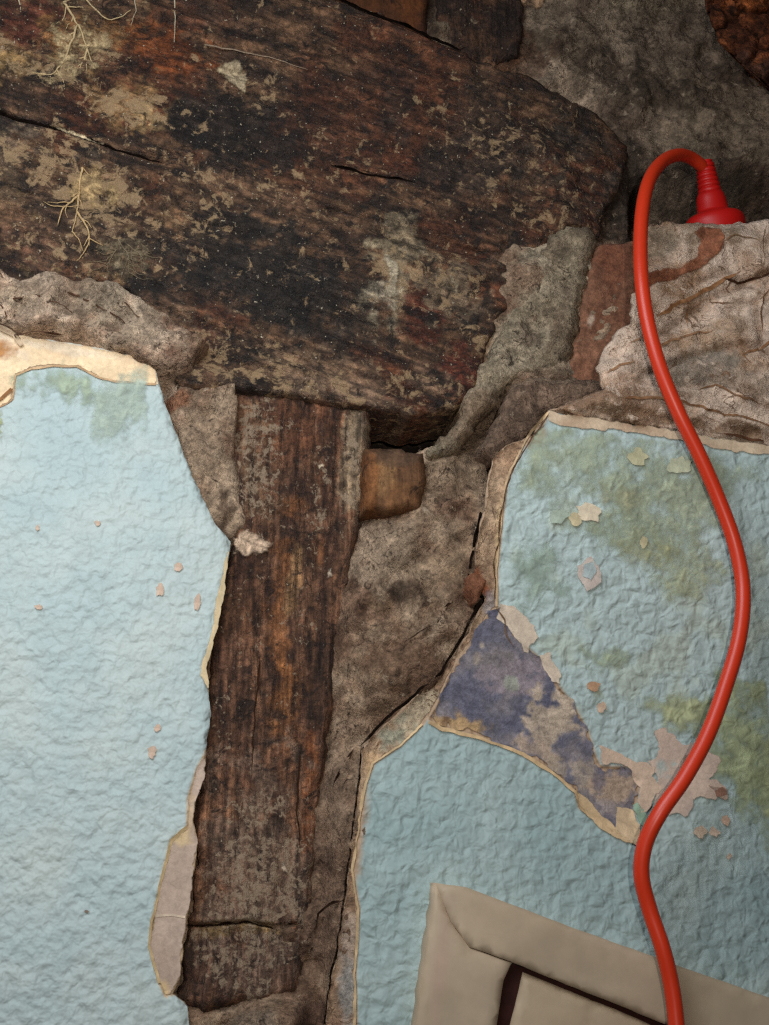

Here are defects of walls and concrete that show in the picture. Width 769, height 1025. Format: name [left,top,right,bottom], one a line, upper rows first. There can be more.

peeling [0,325,158,407]
water stain [515,428,726,597]
crack [606,223,769,373]
crack [624,384,769,442]
peeling [698,435,769,454]
peeling [200,552,229,688]
crack [300,414,549,1025]
peeling [326,410,694,1025]
water stain [645,697,713,737]
peeling [669,752,728,817]
water stain [711,680,769,818]
peeling [148,759,206,994]